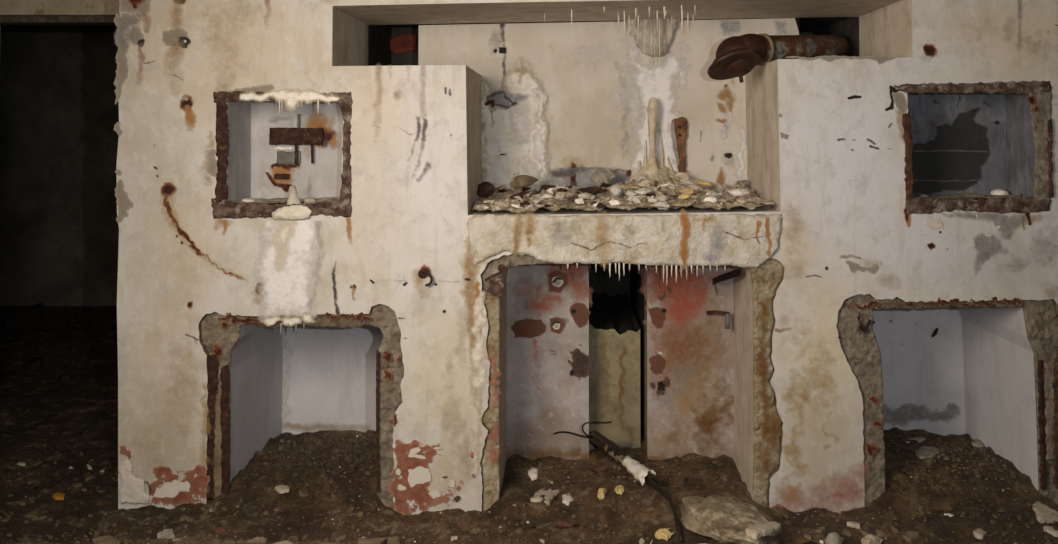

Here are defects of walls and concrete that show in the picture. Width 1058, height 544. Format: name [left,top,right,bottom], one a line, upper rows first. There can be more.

peeling [144,464,210,507]
corrosion [153,166,242,278]
damp [255,221,322,427]
spalling [201,304,461,515]
spalling [481,253,591,511]
damp [481,23,689,191]
peeling [646,266,715,395]
corrosion [680,212,691,268]
spalling [749,258,783,507]
spalling [781,294,1058,510]
corrosion [923,44,937,57]
peeling [912,94,999,195]